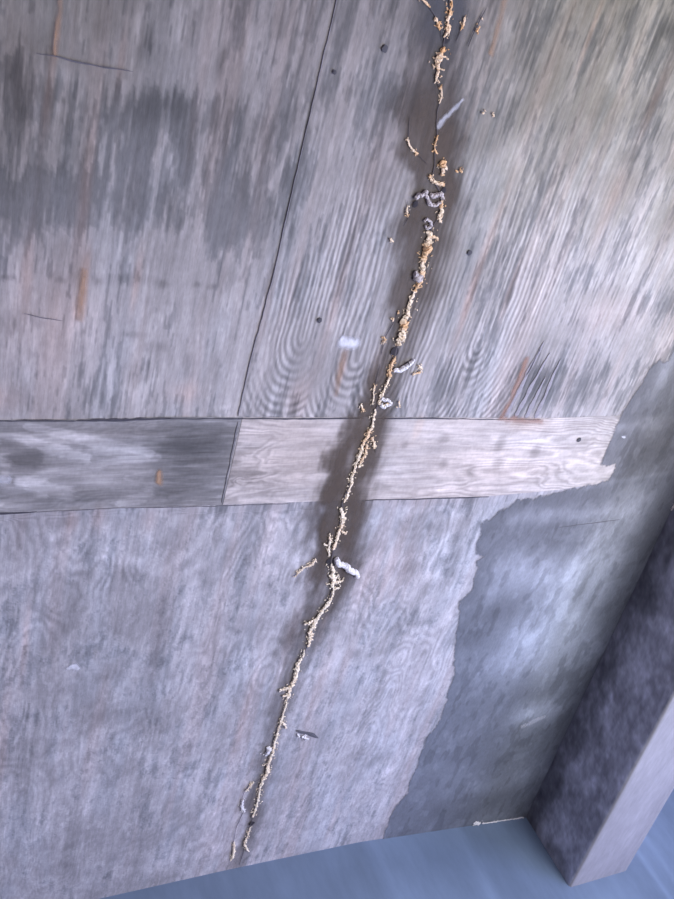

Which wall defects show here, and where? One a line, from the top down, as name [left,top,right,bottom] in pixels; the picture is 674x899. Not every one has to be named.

crack [429,0,486,48]
crack [408,70,446,193]
crack [370,286,420,452]
peeling [504,342,561,418]
crack [306,469,354,568]
crack [232,778,261,864]